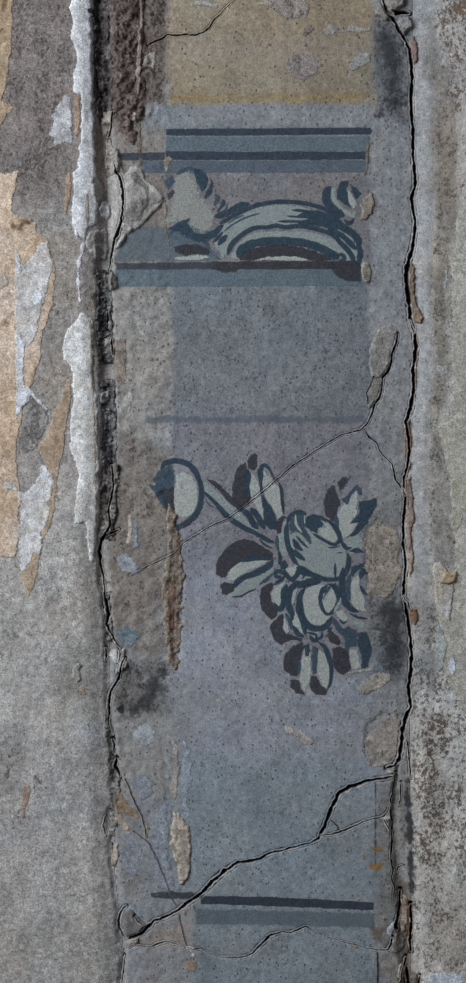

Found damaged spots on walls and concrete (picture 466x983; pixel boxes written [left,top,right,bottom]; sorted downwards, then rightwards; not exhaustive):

peeling [0,0,156,597]
crack [95,0,422,983]
damp [376,32,402,114]